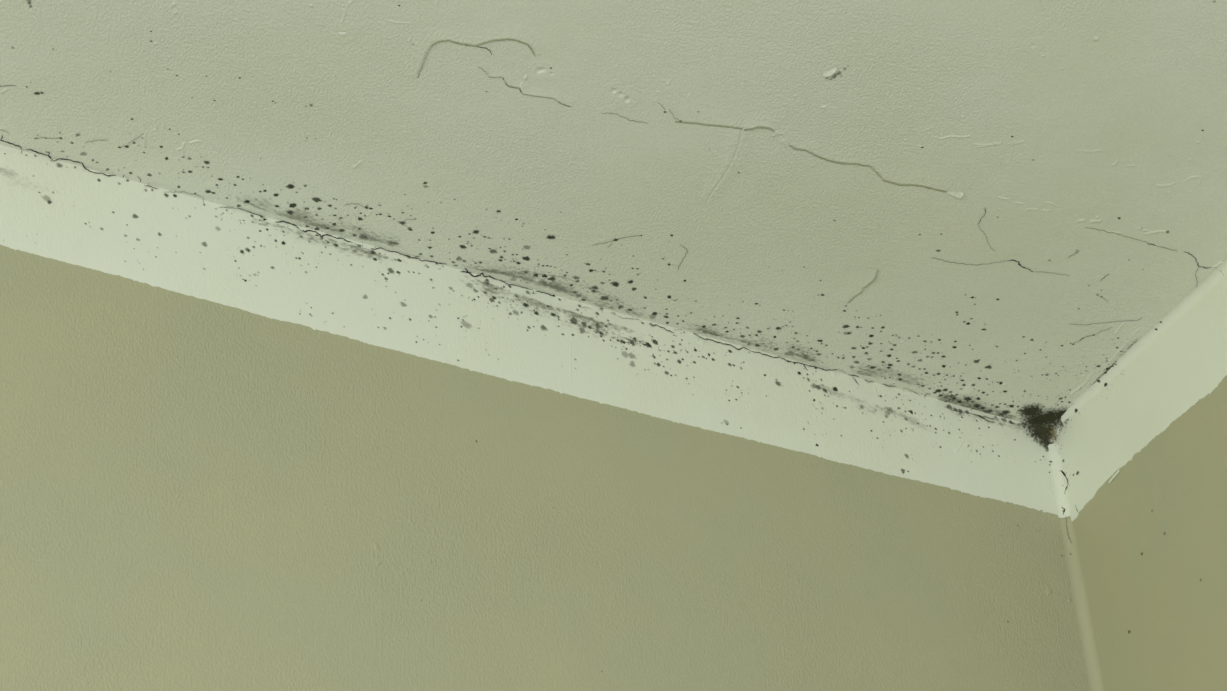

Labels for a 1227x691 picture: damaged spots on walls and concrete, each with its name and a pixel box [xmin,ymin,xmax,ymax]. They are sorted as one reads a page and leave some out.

leakage [148,146,285,244]
crack [1,130,555,296]
leakage [260,184,437,280]
crack [935,210,1068,276]
crack [1091,228,1211,283]
leakage [449,219,1079,476]
crack [586,306,987,421]